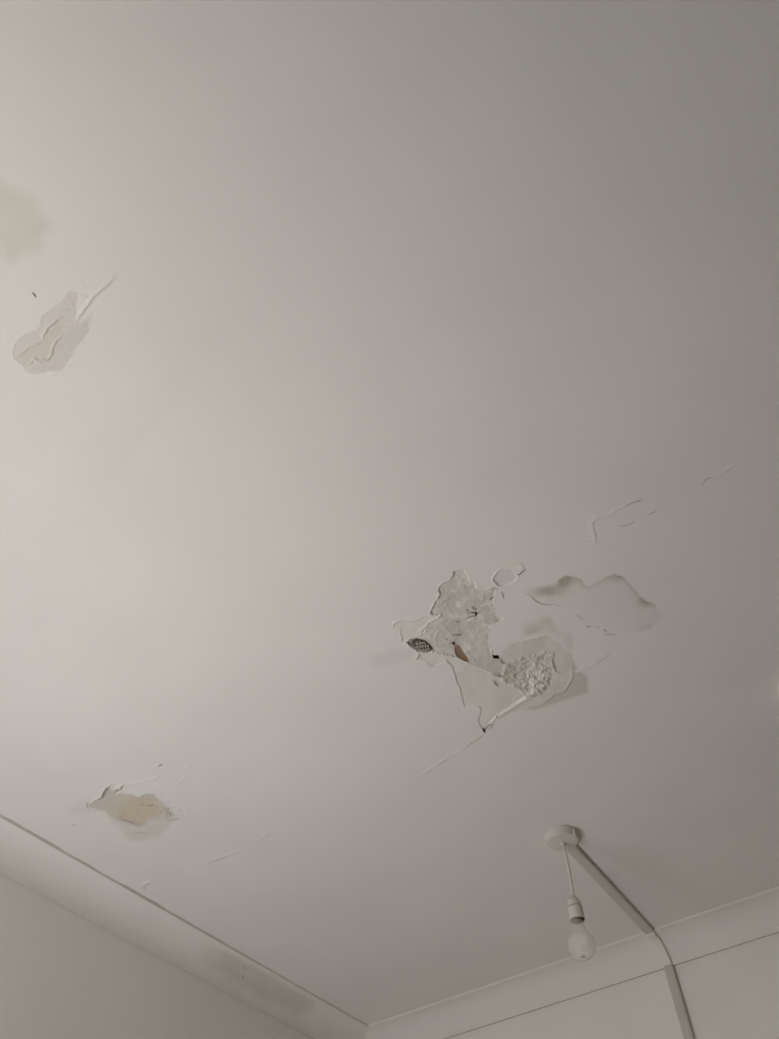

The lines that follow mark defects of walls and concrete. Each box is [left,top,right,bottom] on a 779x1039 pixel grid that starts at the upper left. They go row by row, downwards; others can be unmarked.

peeling [8,273,120,381]
flaking render [390,563,591,736]
peeling [84,763,190,829]